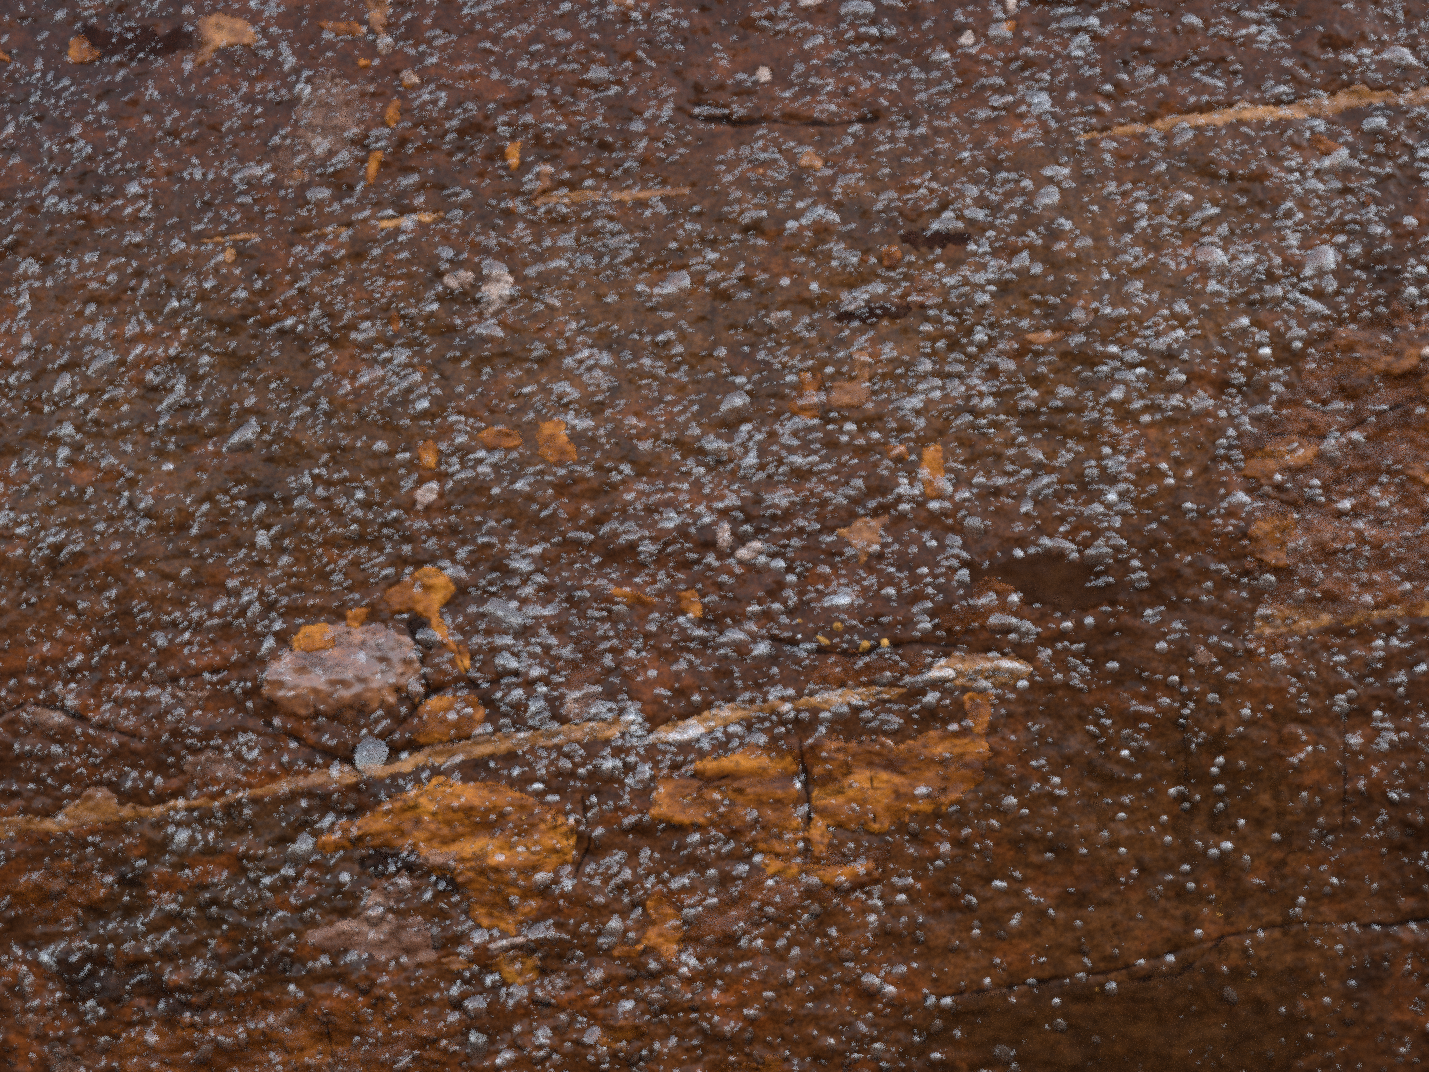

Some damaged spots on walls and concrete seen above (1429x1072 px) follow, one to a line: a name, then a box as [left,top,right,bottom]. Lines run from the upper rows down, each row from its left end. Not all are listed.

corrosion [554,629,643,691]
corrosion [812,649,933,693]
corrosion [644,845,891,970]